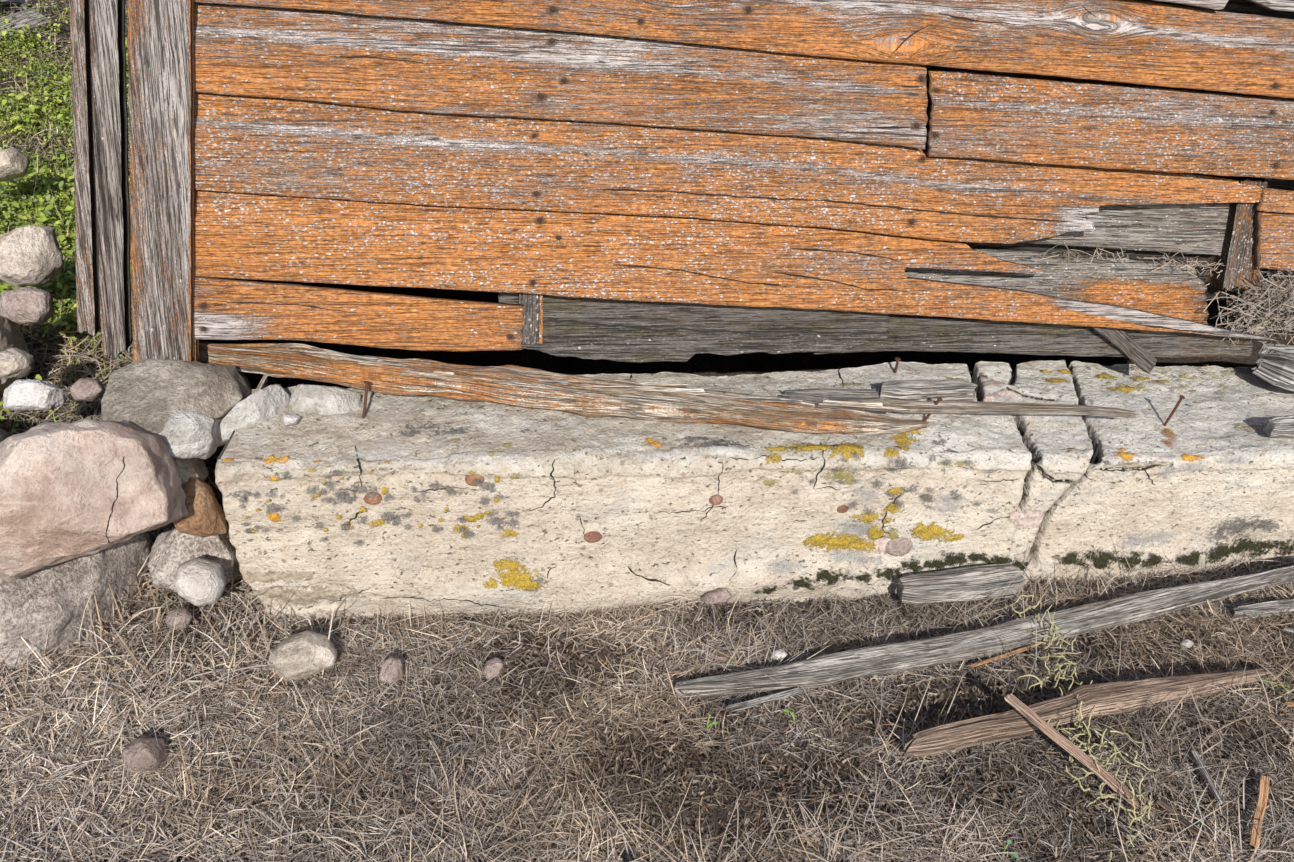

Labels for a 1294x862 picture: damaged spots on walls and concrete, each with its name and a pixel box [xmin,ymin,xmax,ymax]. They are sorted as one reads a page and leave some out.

crack [967,365,1158,552]